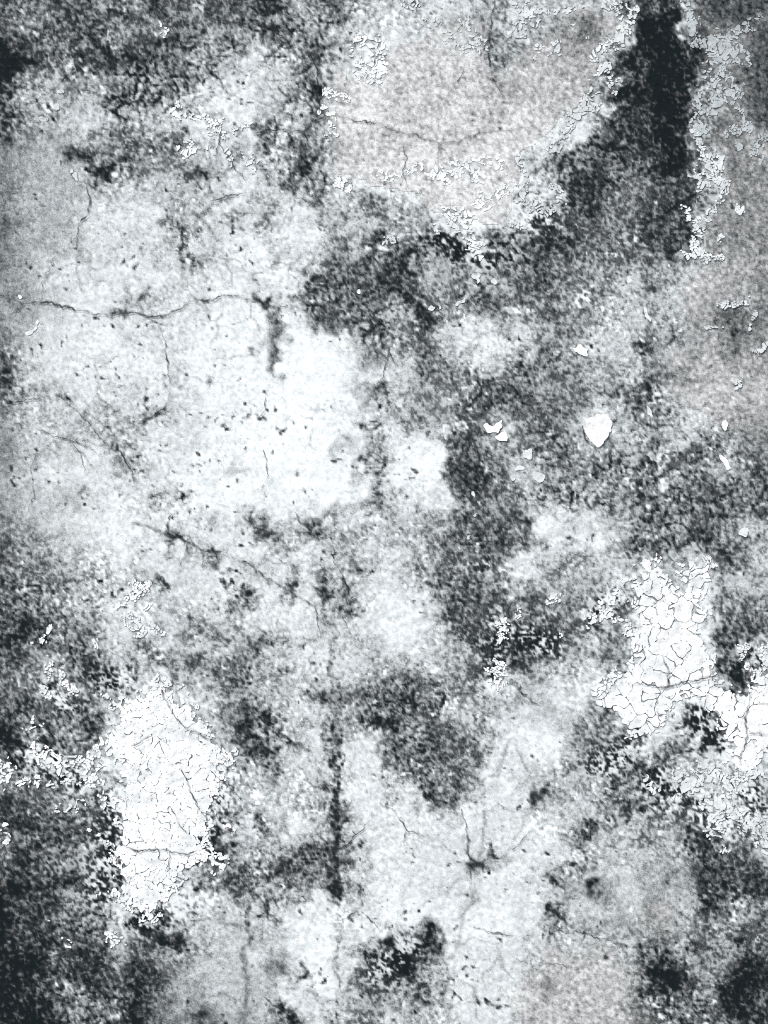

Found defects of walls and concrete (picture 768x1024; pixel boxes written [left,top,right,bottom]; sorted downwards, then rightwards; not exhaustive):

crack [26,257,284,375]
damp [0,0,339,207]
peeling [666,0,768,451]
crack [41,418,133,478]
damp [194,0,768,908]
peeling [40,661,79,700]
damp [0,518,191,1024]
peeling [104,931,127,948]
peeling [0,673,239,923]
damp [172,637,295,759]
damp [563,705,768,1024]
peeling [582,553,768,855]